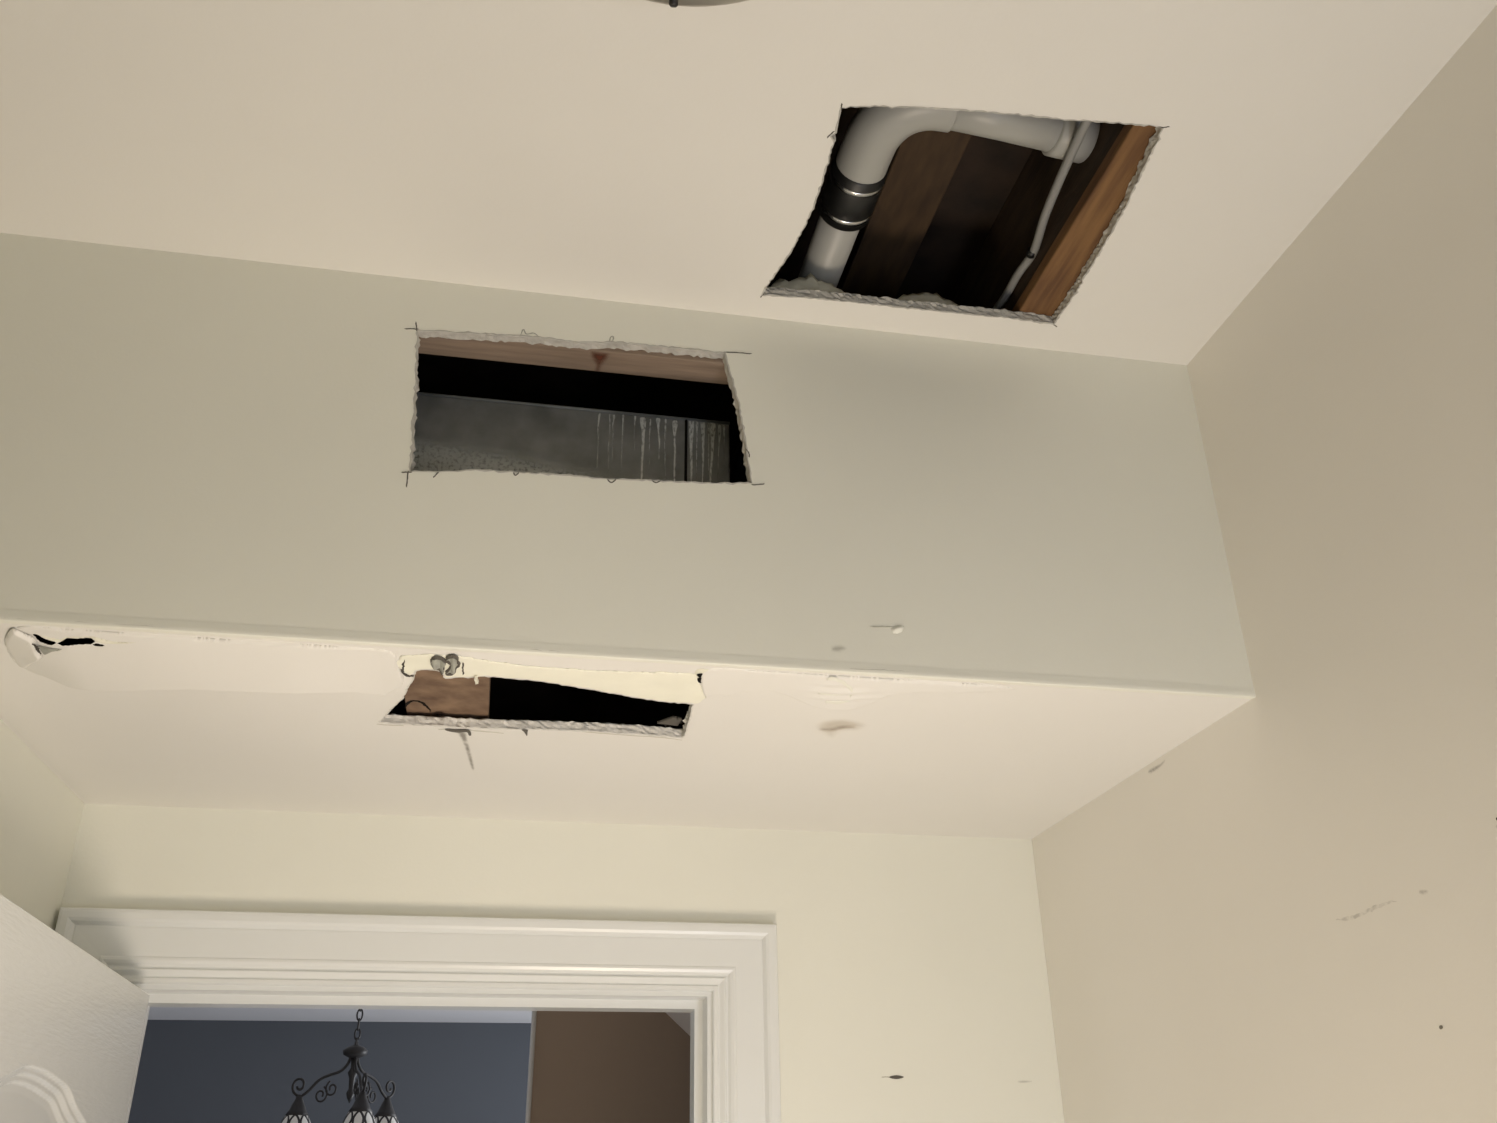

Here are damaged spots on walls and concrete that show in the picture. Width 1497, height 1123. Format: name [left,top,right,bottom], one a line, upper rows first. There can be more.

spalling [33,634,102,646]
spalling [397,654,708,729]
spalling [389,696,407,715]